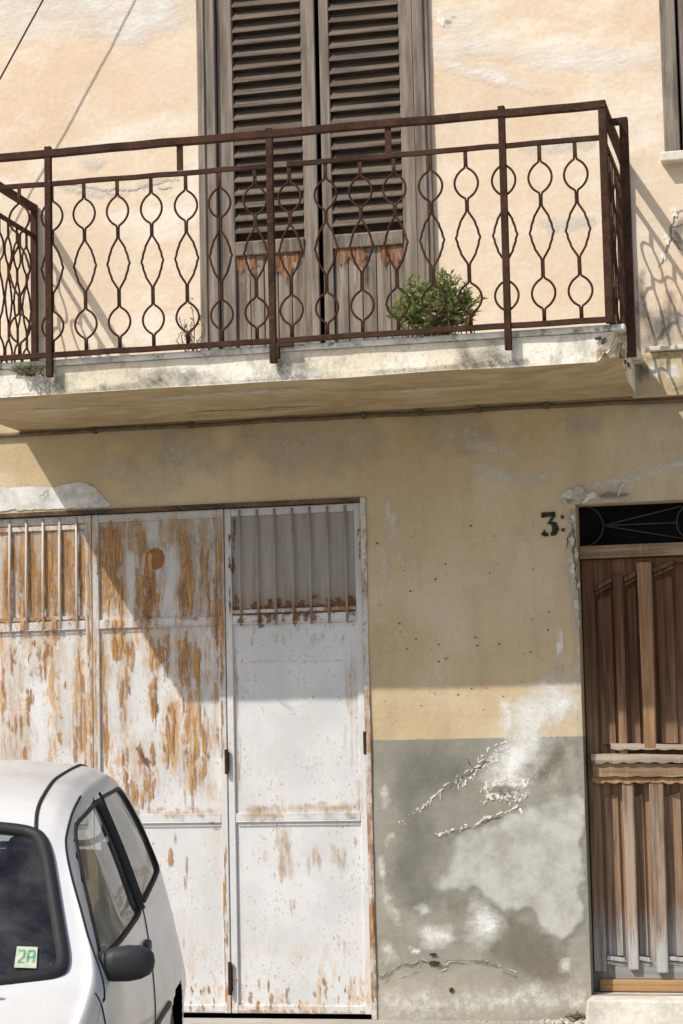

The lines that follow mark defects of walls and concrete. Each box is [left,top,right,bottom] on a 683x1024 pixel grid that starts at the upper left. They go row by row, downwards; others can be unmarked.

peeling [236,255,259,284]
peeling [335,244,404,271]
flaking render [561,482,630,632]
corrosion [0,519,356,813]
leakage [495,681,570,784]
crack [398,734,529,838]
corrosion [167,834,192,896]
corrosion [184,842,376,1013]
crack [380,959,518,984]
leakage [470,907,499,937]